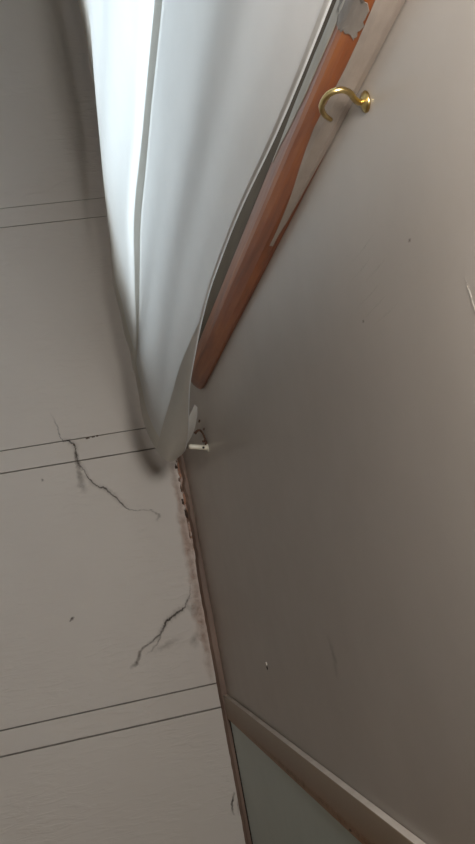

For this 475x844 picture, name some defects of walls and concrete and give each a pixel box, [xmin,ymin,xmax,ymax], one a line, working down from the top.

peeling [270,0,406,246]